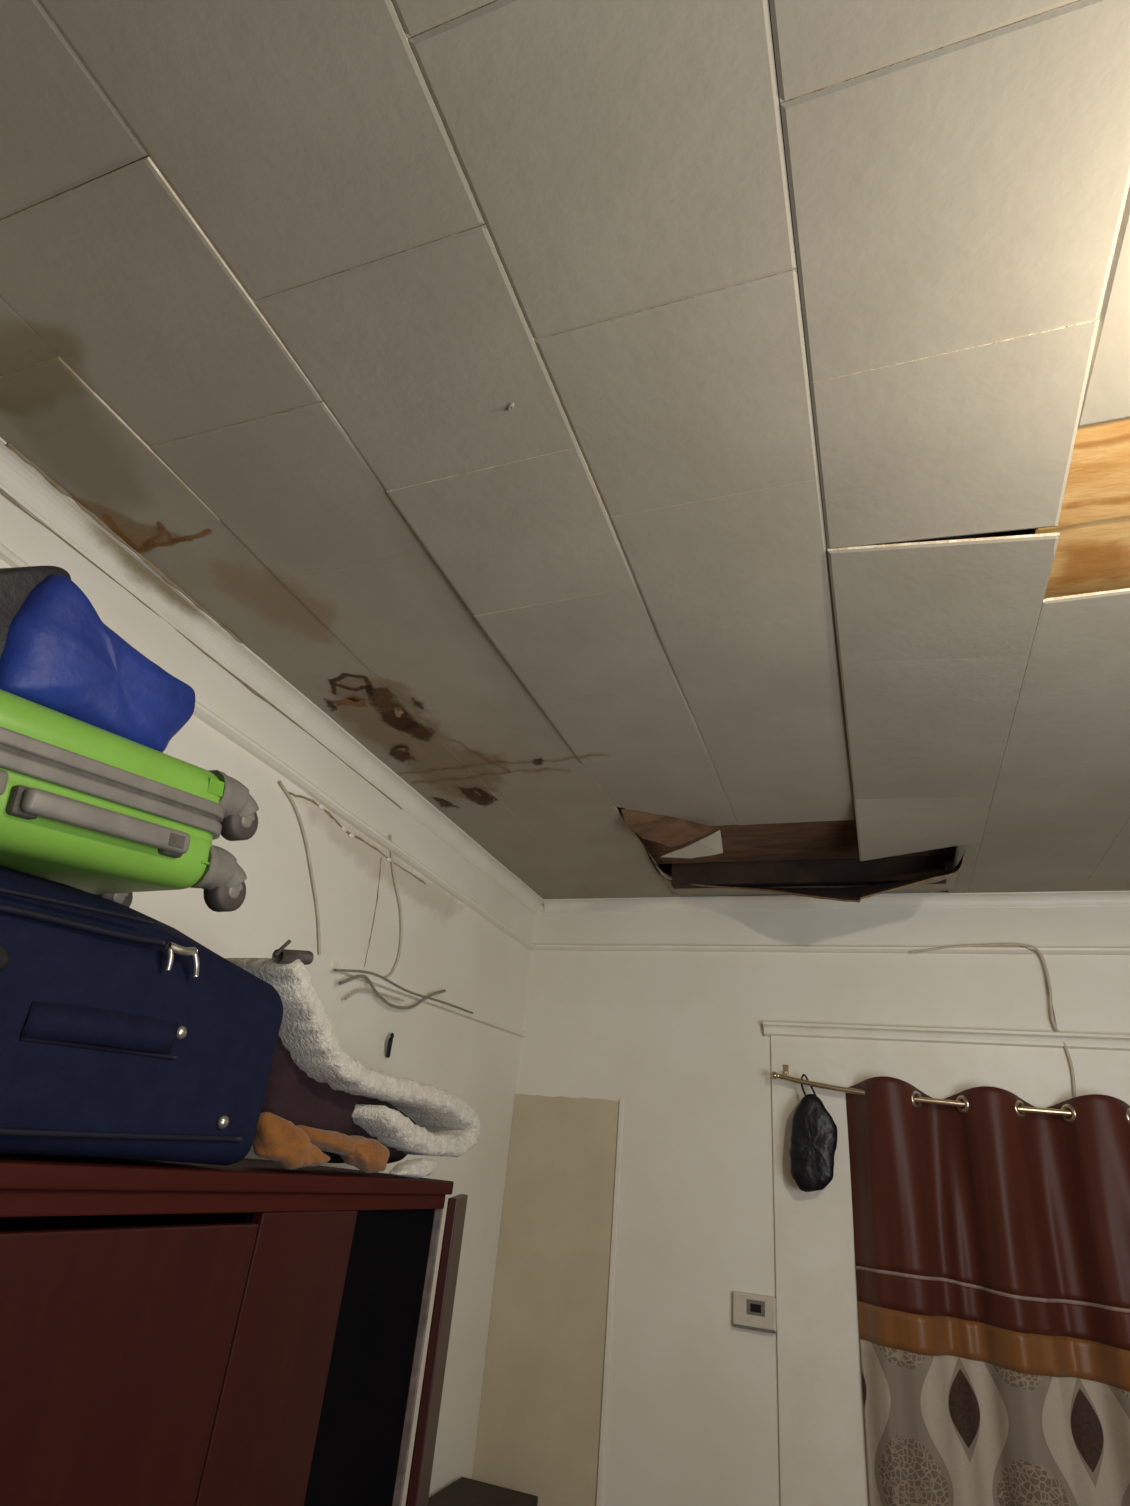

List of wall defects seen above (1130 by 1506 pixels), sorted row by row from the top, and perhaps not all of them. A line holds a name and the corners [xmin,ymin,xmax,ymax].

damp [325,673,434,762]
damp [434,787,498,808]